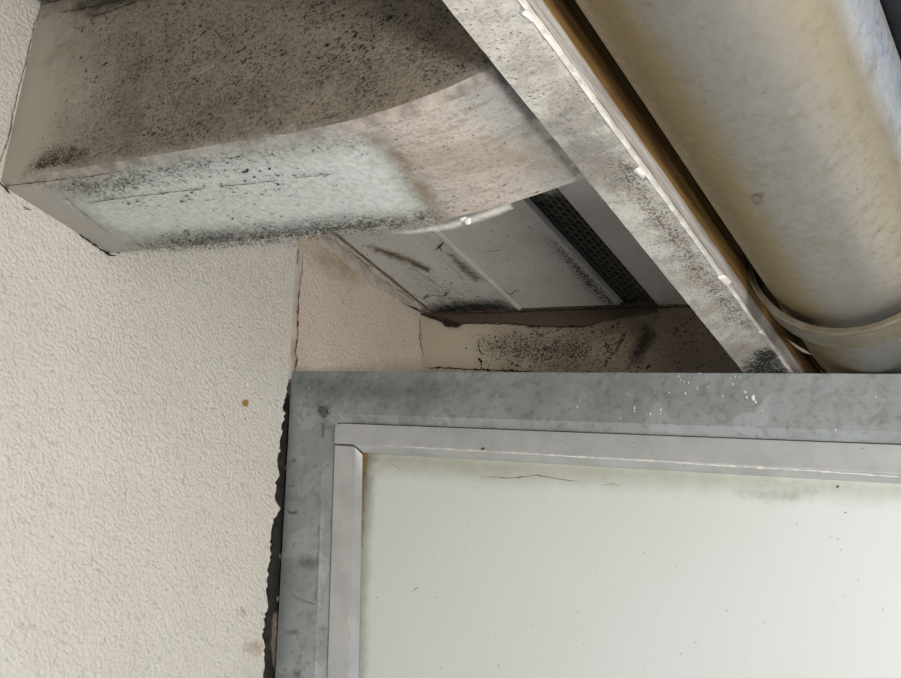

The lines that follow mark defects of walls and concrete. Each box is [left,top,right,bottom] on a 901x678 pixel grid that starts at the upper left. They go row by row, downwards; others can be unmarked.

water stain [62,154,449,250]
water stain [465,85,795,373]
water stain [358,246,514,313]